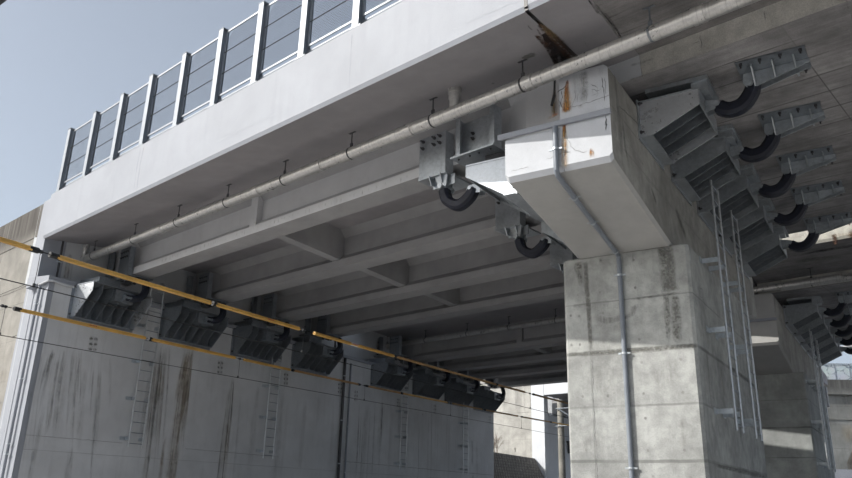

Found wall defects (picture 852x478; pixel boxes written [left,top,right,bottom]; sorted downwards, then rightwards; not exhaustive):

damp [526,12,573,65]
corrosion [553,82,569,116]
crack [558,79,609,128]
damp [575,264,591,339]